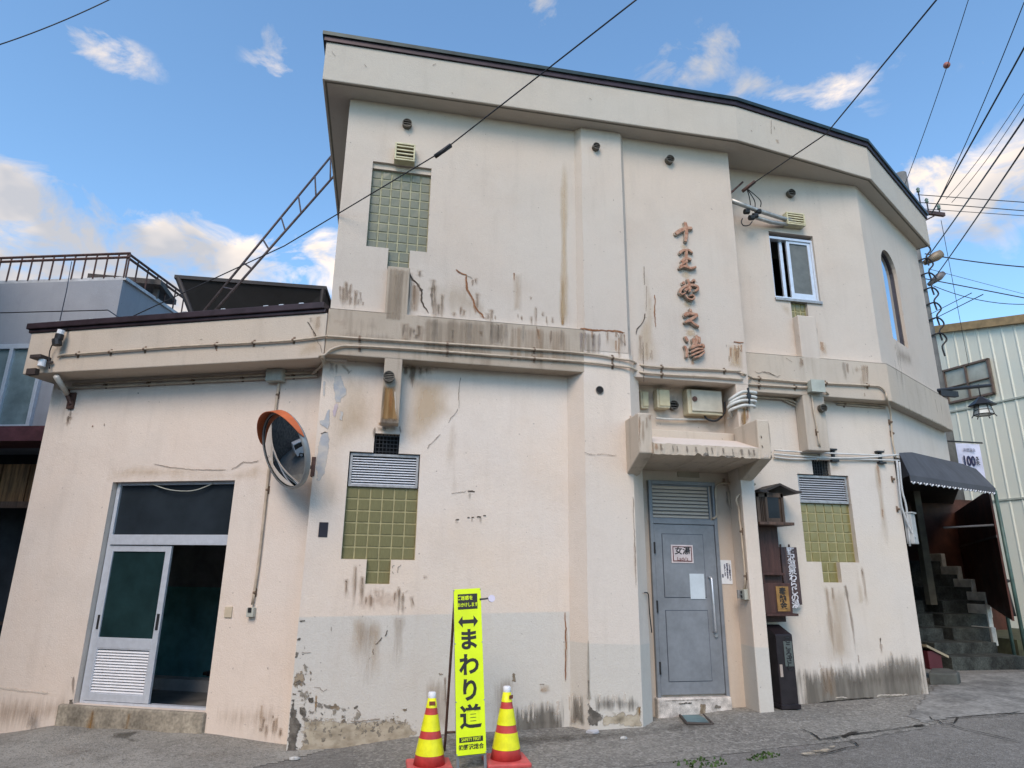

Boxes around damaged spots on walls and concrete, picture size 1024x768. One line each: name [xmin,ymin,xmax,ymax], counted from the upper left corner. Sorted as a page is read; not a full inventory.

crack [410,274,428,312]
crack [456,269,484,318]
peeling [316,376,346,481]
crack [156,461,257,470]
peeling [280,638,407,751]